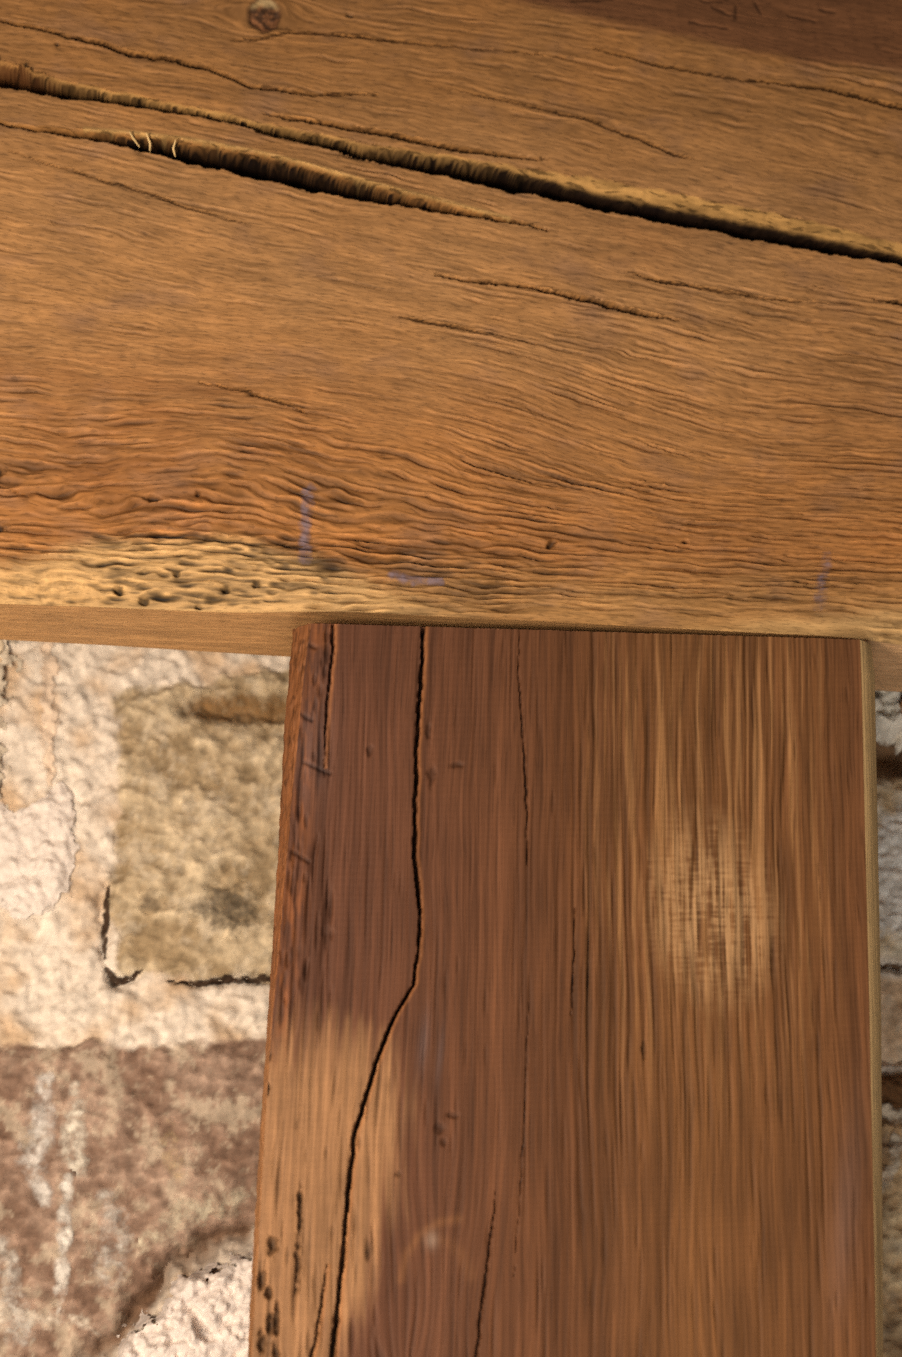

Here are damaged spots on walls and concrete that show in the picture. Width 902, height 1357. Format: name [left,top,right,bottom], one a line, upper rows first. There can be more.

crack [0,18,902,266]
crack [874,298,902,306]
crack [309,626,426,1357]